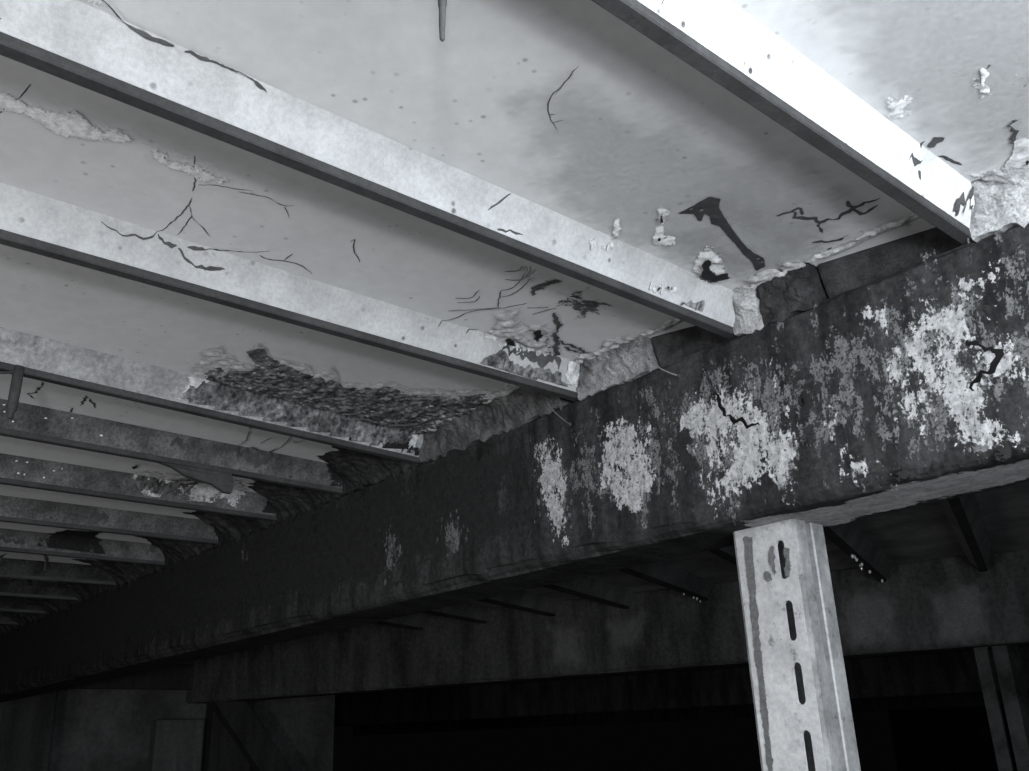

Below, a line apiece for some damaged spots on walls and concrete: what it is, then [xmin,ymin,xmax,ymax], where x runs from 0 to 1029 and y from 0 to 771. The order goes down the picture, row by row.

crack [102,0,267,92]
crack [547,67,578,130]
peeling [1004,138,1029,168]
crack [102,156,312,274]
crack [488,193,523,235]
spalling [652,197,780,289]
crack [777,198,880,250]
crack [438,267,588,370]
spalling [177,342,500,446]
crack [965,340,1004,391]
spalling [131,466,246,508]
damp [0,233,1029,690]